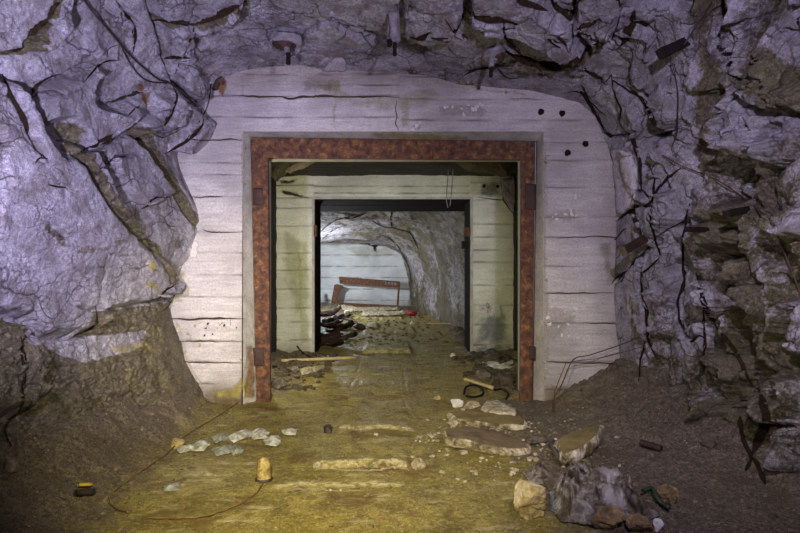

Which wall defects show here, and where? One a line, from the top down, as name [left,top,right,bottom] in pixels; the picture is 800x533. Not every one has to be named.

crack [240,95,400,130]
rust [319,305,358,348]
damp [483,319,504,341]